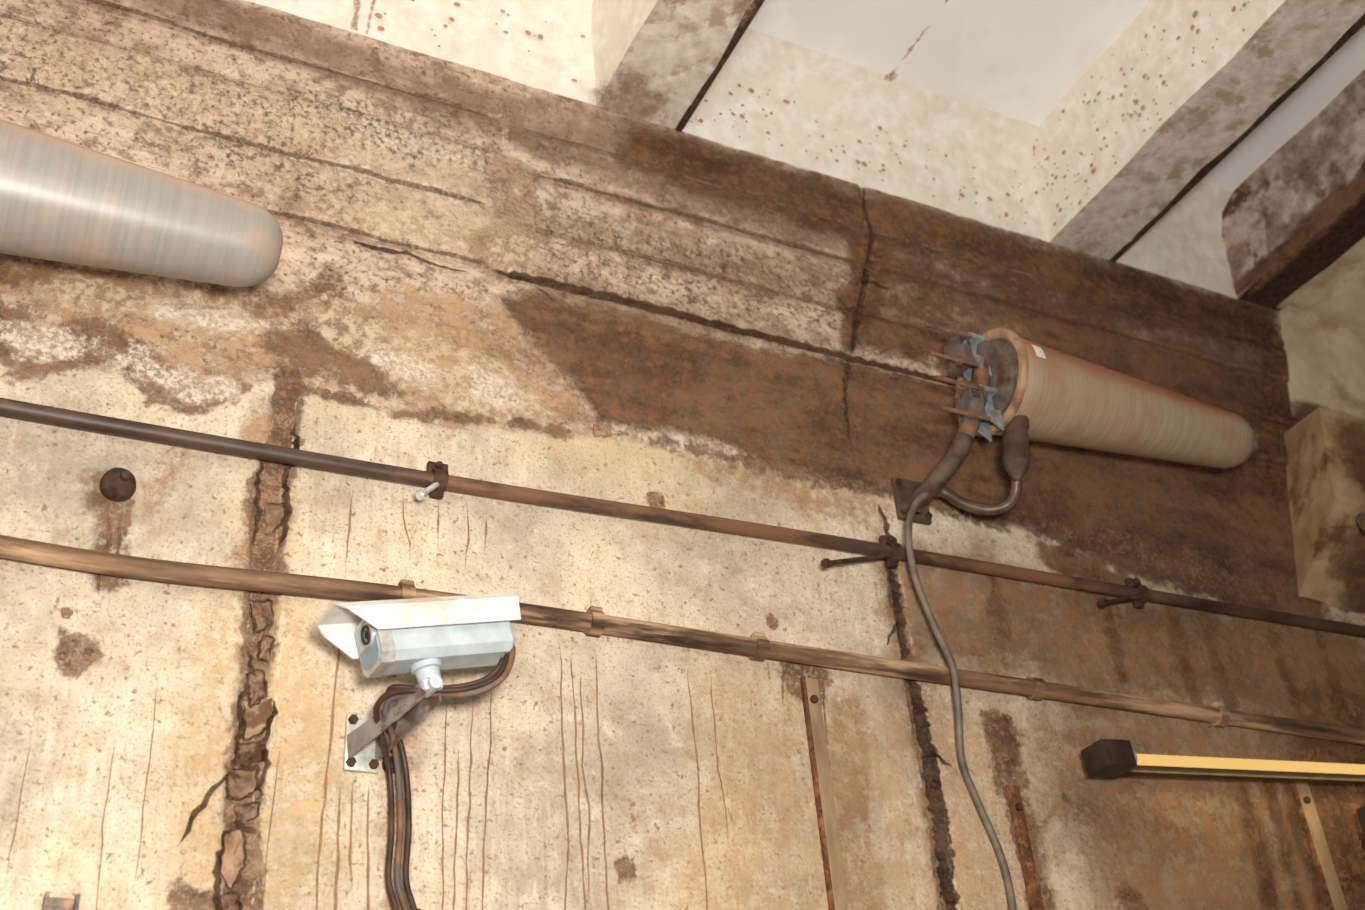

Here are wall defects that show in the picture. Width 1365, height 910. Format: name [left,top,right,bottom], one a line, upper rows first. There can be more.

crack [354,188,956,437]
damp [0,0,1365,619]
rust [86,471,135,554]
rust [93,573,129,605]
crack [181,598,279,910]
crack [252,425,300,544]
rust [779,662,833,705]
crack [878,506,960,910]
rust [980,710,1055,910]
damp [907,563,1365,730]